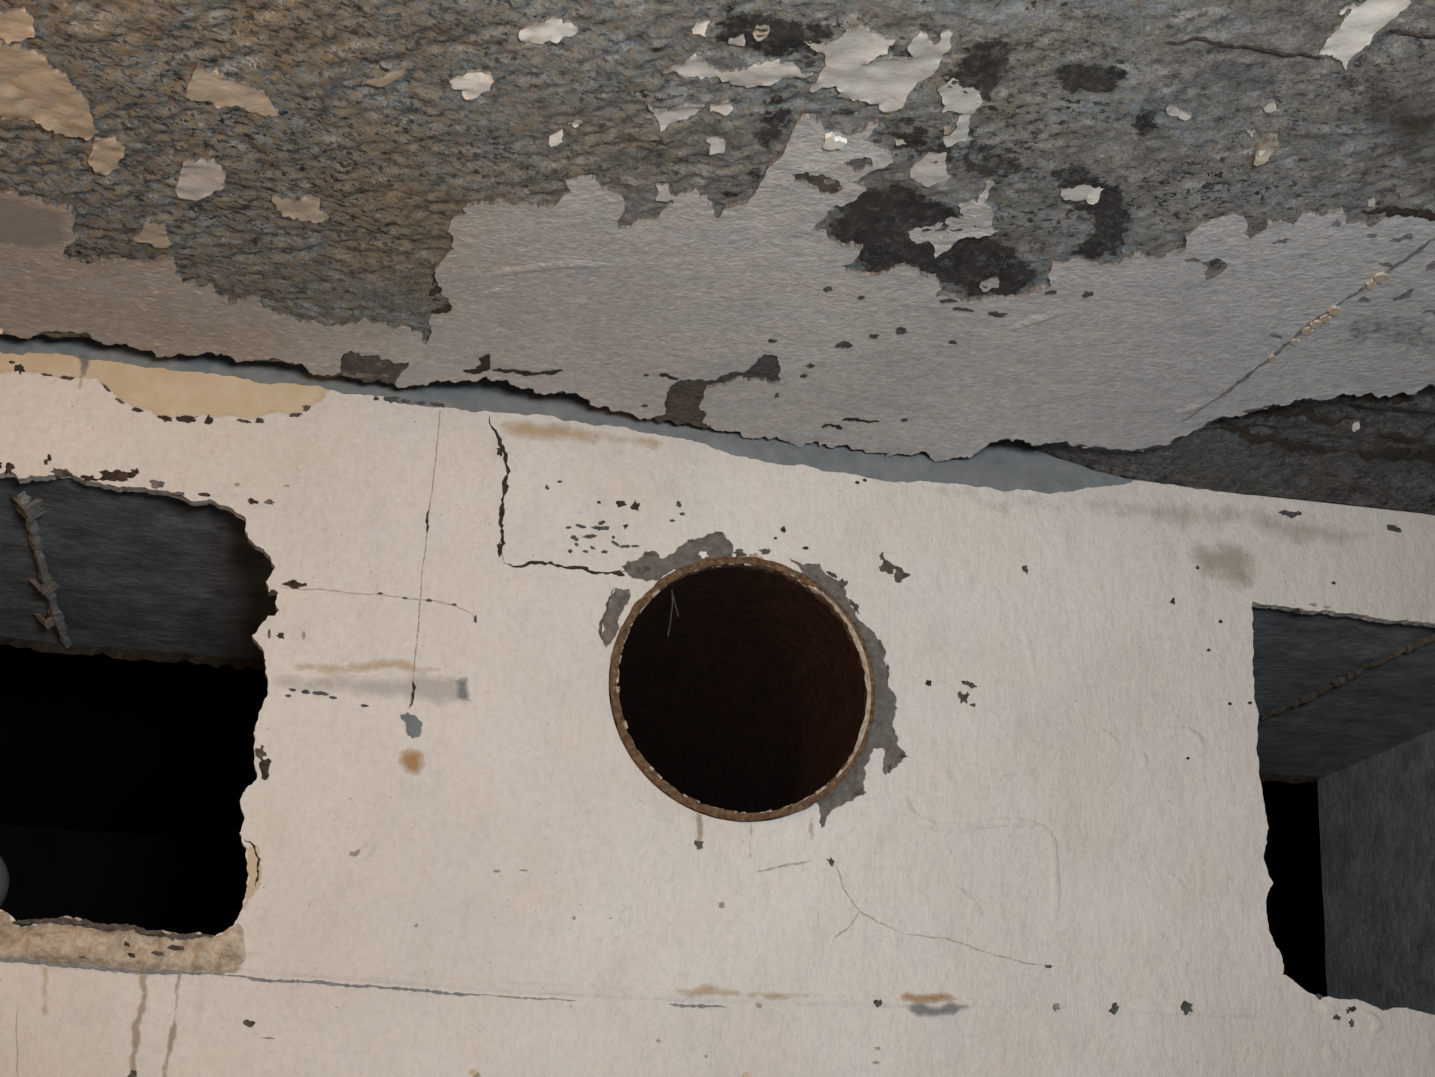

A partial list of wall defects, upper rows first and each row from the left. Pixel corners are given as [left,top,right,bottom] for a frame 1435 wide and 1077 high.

crack [463,354,563,376]
peeling [0,0,1435,533]
crack [1182,206,1435,422]
crack [282,411,477,739]
crack [489,416,625,576]
peeling [566,500,786,647]
peeling [790,546,911,828]
flaking render [0,840,262,975]
crack [13,1004,21,1074]